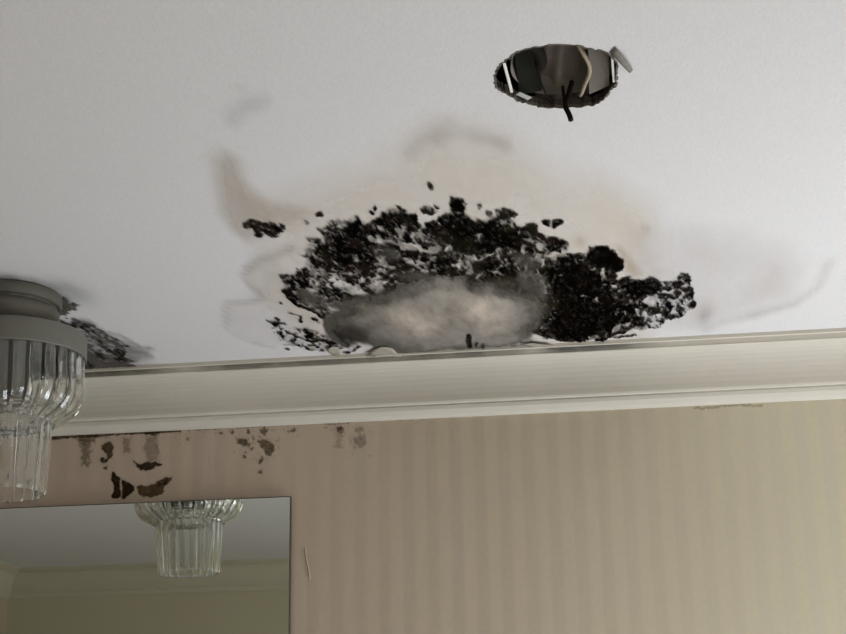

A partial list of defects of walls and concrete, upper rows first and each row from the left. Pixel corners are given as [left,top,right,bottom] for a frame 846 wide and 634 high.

damp [243,220,285,238]
damp [266,197,697,354]
damp [59,297,139,369]